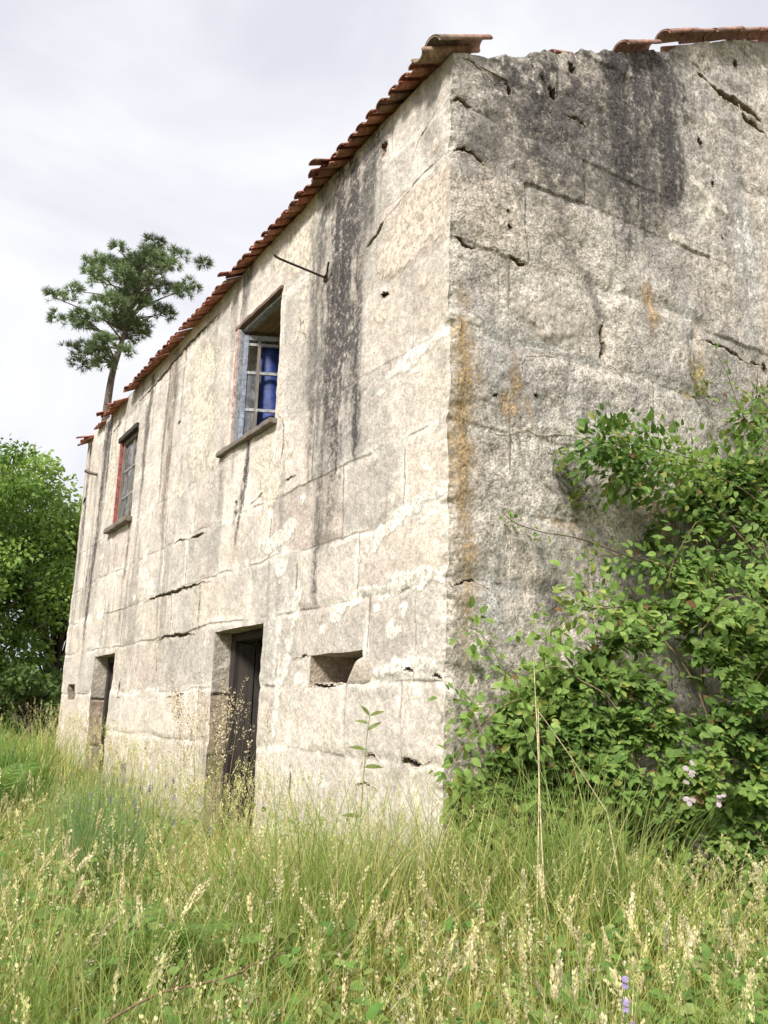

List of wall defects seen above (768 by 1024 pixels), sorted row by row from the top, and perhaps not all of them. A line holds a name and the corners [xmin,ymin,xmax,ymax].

crack [357,91,491,271]
water stain [467,49,688,248]
crack [696,71,766,134]
water stain [306,129,382,593]
rust [448,317,481,520]